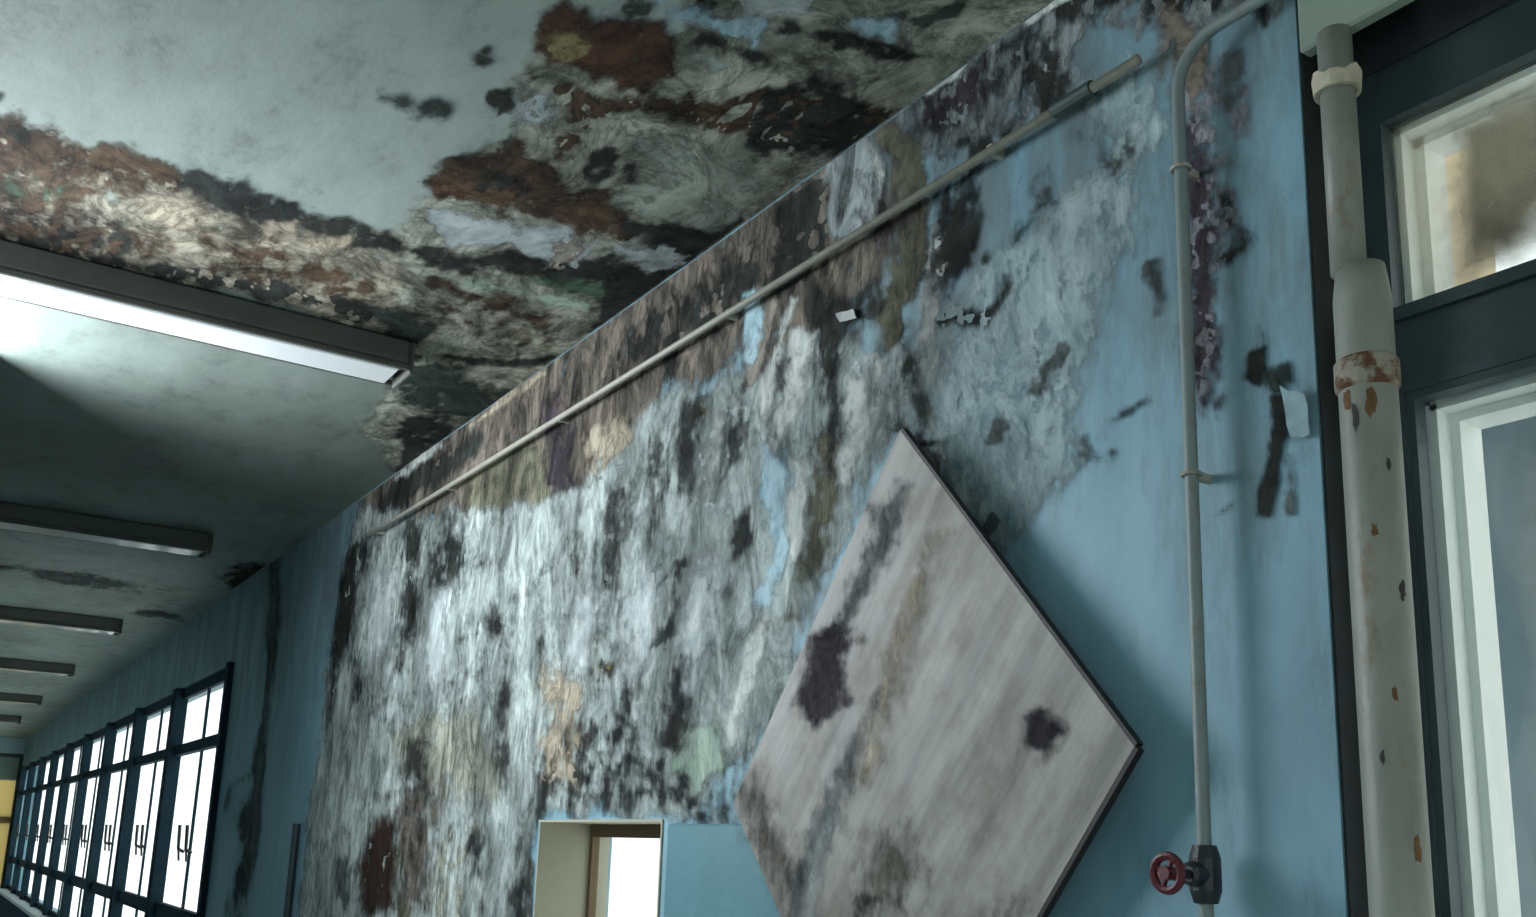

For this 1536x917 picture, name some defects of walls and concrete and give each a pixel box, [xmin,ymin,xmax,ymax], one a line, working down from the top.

corrosion [534,0,675,95]
flaking render [0,0,1053,472]
leakage [350,0,1284,619]
peeling [1244,343,1310,517]
corrosion [1343,386,1377,433]
leakage [0,565,141,592]
leakage [134,611,184,622]
leakage [791,486,904,727]
leakage [731,533,946,917]
leakage [1024,708,1065,751]
leakage [334,776,483,917]
corrosion [1414,834,1422,863]